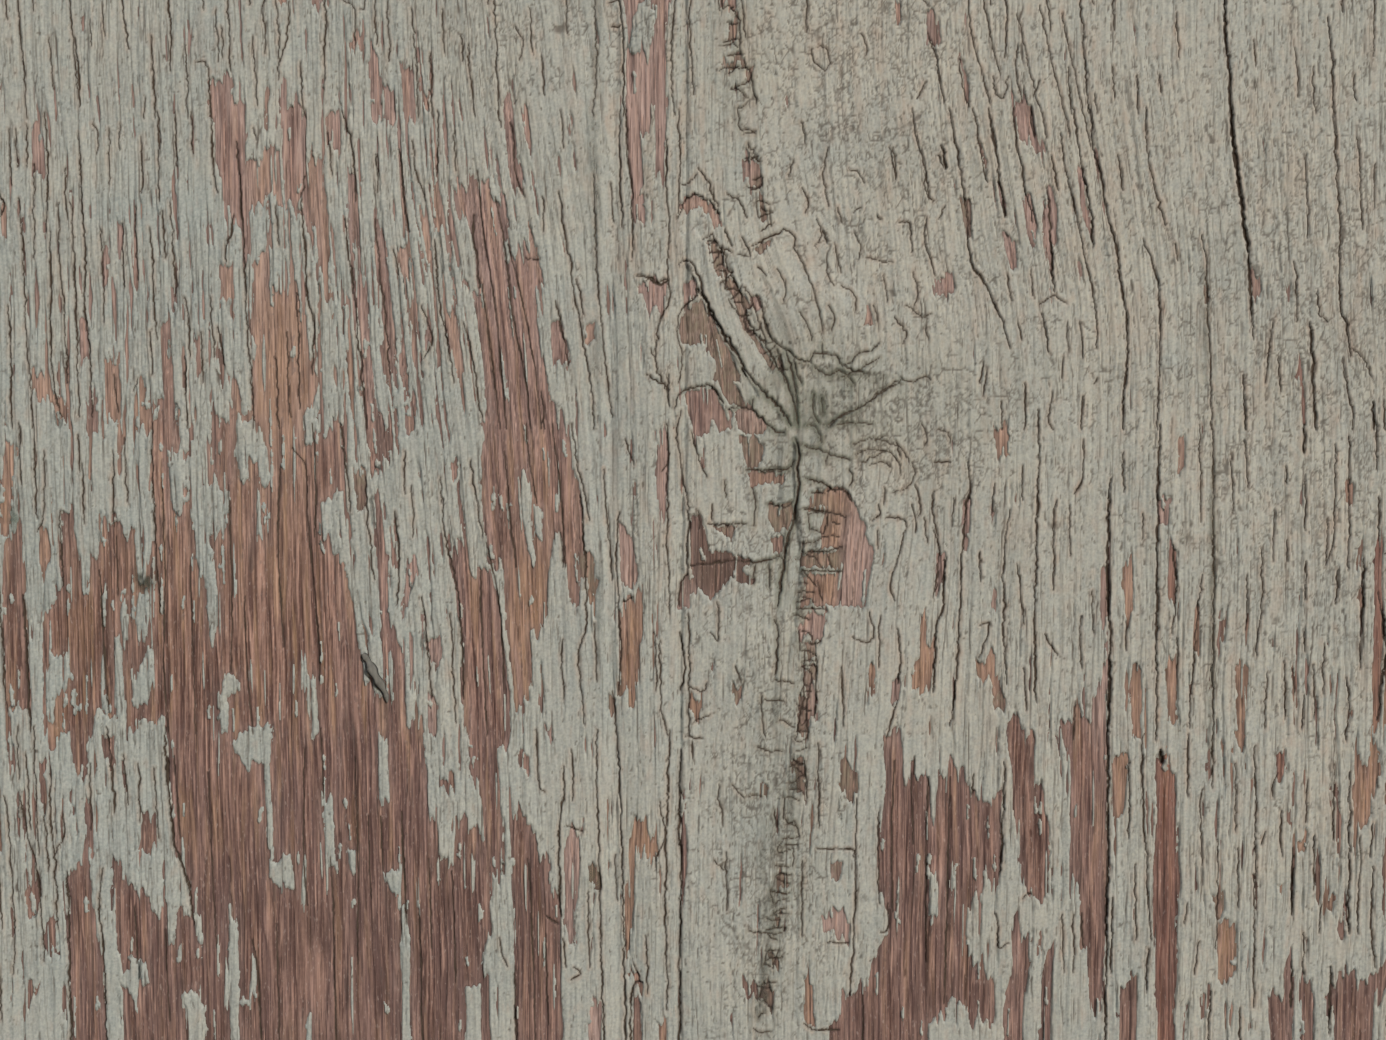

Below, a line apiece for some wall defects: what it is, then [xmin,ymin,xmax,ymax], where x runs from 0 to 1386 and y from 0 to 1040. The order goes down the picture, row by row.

crack [0,428,217,1040]
crack [228,487,253,733]
crack [252,923,280,1040]
peeling [0,0,610,1040]
crack [303,730,456,1040]
peeling [585,260,785,488]
peeling [677,515,755,610]
peeling [768,486,885,853]
crack [327,0,1386,1040]
peeling [804,538,1265,1040]
peeling [1268,940,1386,1040]
peeling [1276,527,1386,940]